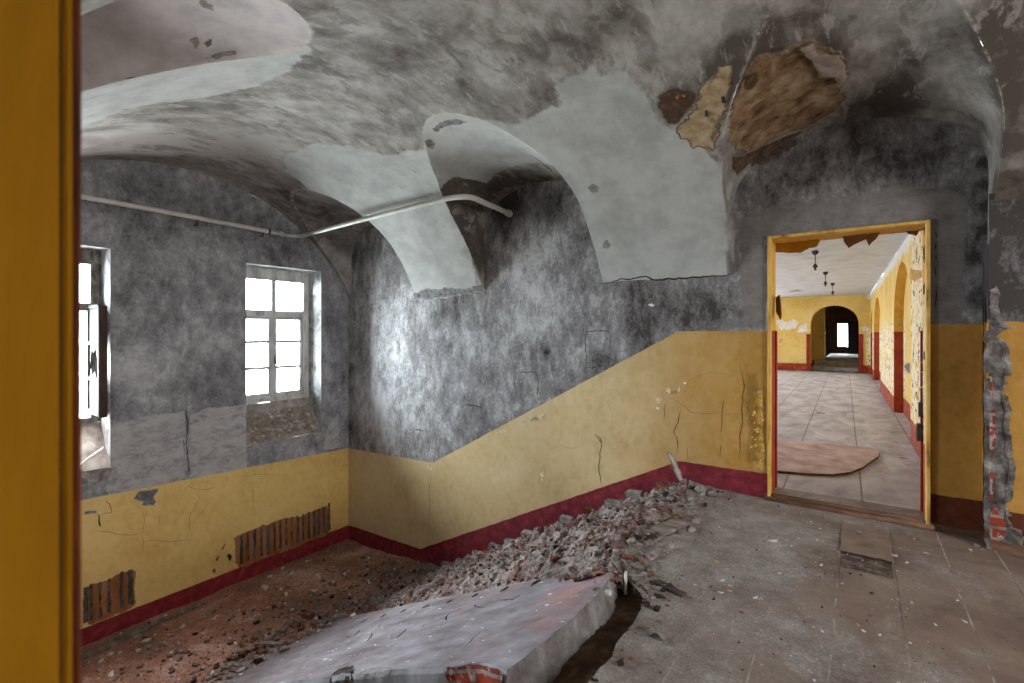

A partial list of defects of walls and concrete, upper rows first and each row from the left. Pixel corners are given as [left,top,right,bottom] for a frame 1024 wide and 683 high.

peeling [189,37,237,60]
flaking render [676,37,851,153]
peeling [904,226,925,443]
peeling [133,488,159,506]
crack [97,402,258,550]
crack [556,406,613,484]
crack [663,367,745,461]
flaking render [983,285,1024,546]